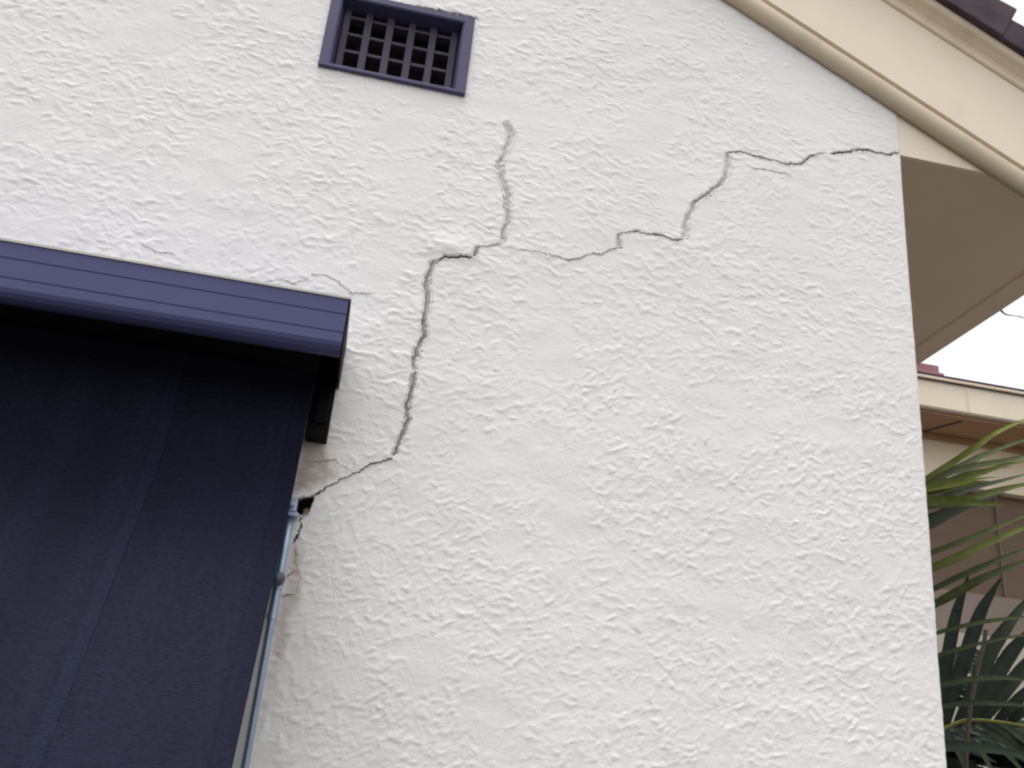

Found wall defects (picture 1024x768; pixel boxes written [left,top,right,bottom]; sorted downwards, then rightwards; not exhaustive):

crack [266,120,900,597]